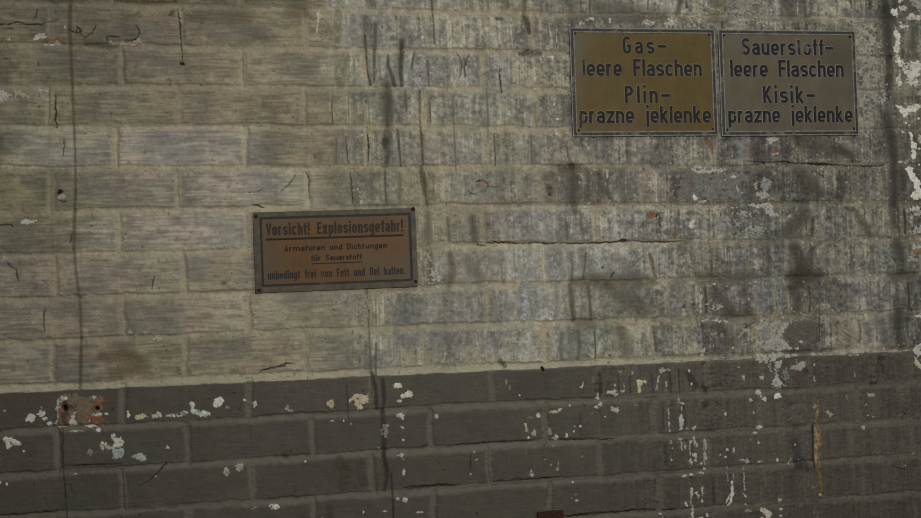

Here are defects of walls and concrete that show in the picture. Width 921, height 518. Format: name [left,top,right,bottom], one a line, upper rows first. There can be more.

crack [75,26,142,46]
leakage [383,0,438,166]
peeling [890,0,921,262]
peeling [697,288,742,358]
peeling [752,310,815,371]
peeling [913,343,921,369]
peeling [3,437,25,452]
peeling [25,393,146,461]
peeling [127,397,230,420]
peeling [349,393,369,410]
peeling [393,383,413,441]